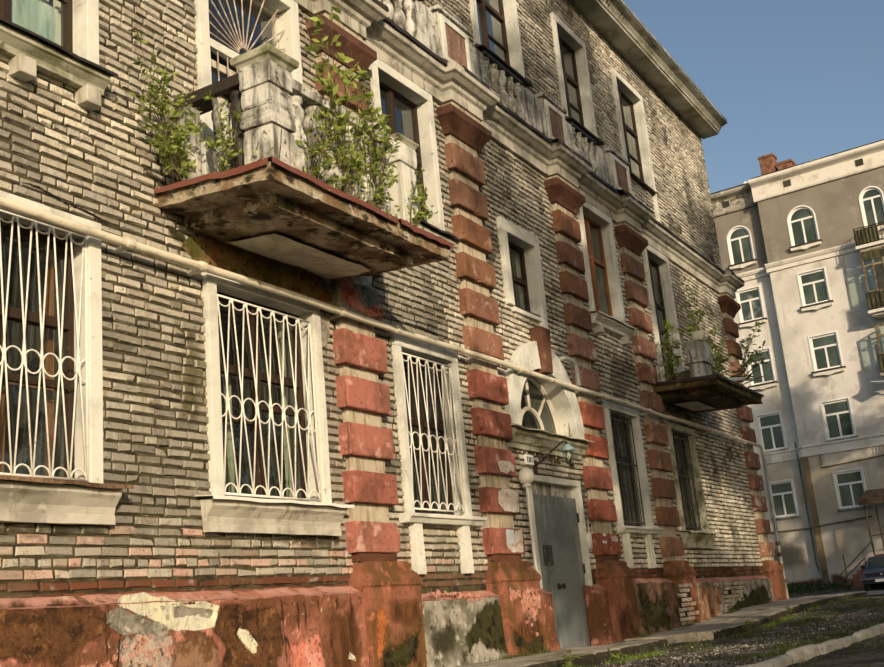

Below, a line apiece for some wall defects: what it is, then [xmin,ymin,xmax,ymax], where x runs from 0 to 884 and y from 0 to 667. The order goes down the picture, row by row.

flaking render [331,275,384,321]
leakage [774,546,803,566]
flaking render [80,592,219,667]
flaking render [237,628,258,654]
peeling [510,586,541,636]